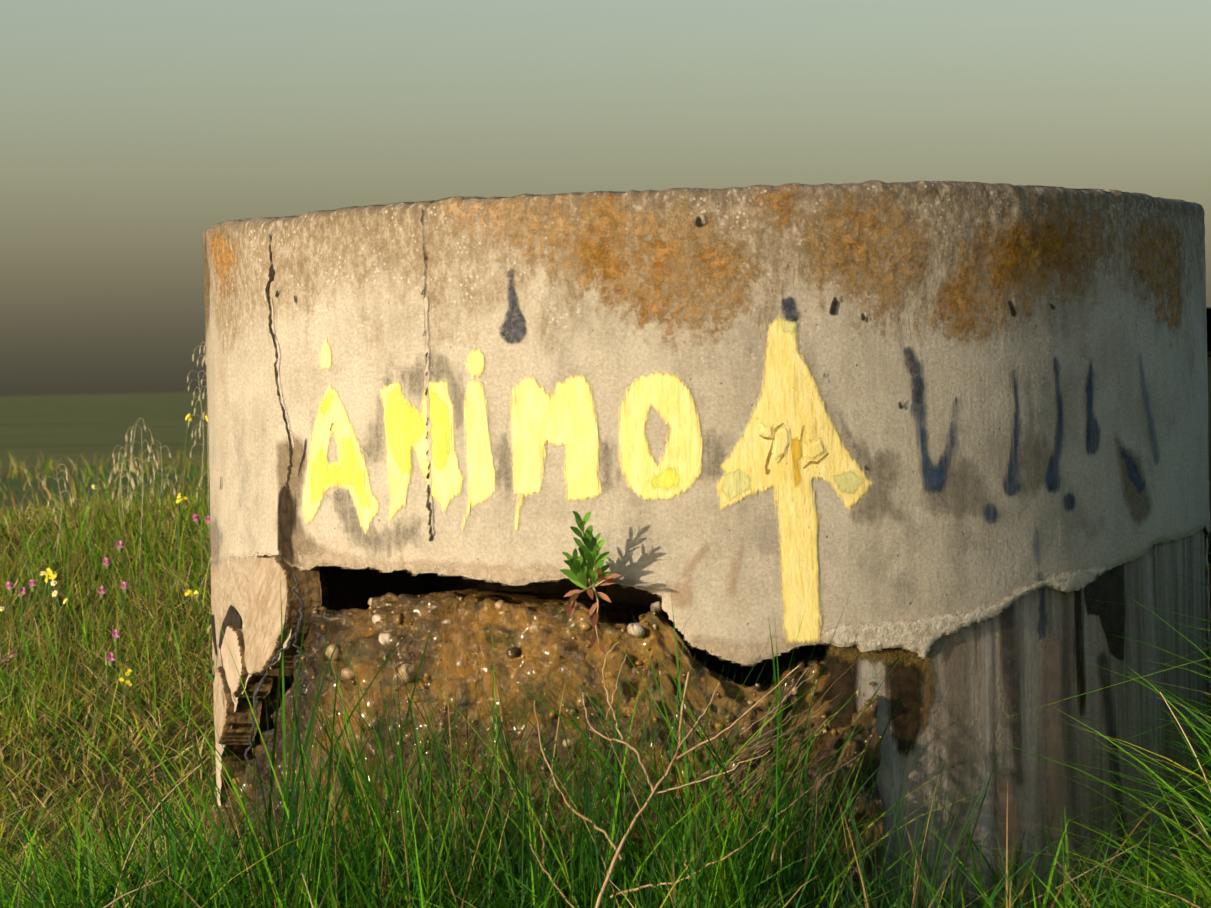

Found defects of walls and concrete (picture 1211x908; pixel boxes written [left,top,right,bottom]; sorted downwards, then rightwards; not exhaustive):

crack [213,234,306,559]
crack [421,210,434,541]
spalling [197,552,1119,908]
leakage [826,648,924,832]
leakage [950,595,1032,908]
leakage [1045,563,1132,896]